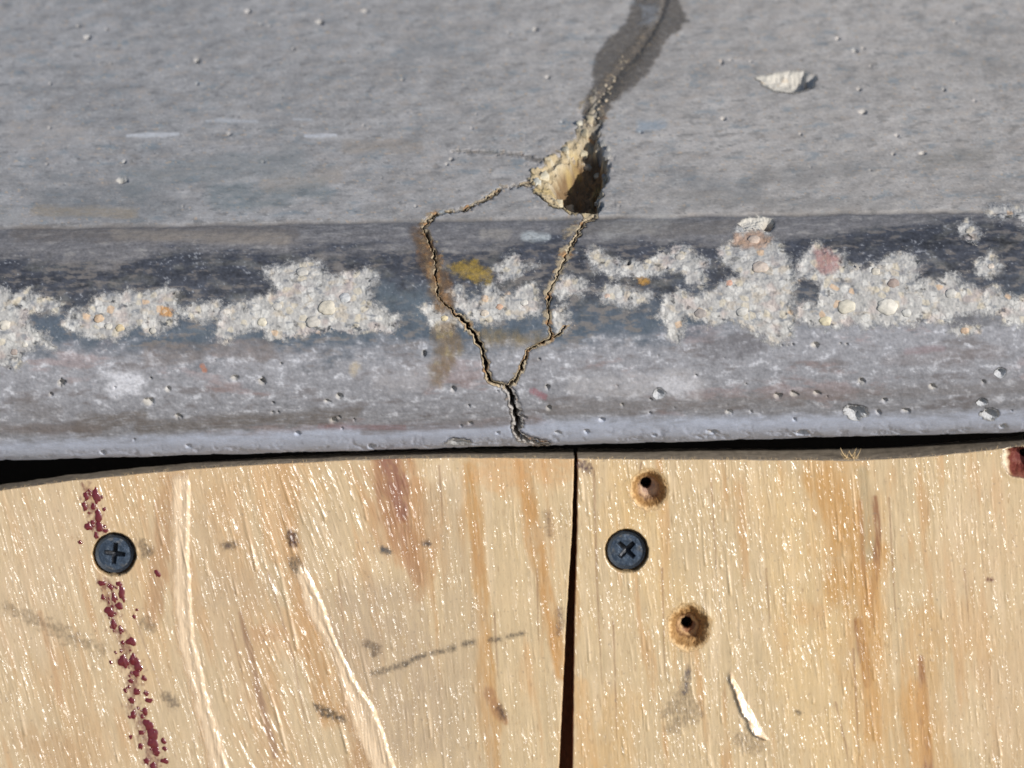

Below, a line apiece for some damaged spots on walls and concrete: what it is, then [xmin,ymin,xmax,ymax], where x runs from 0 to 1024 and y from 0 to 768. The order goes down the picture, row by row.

crack [580,54,640,147]
damp [583,0,688,132]
spalling [0,257,401,371]
crack [420,158,598,446]
spalling [418,200,1024,346]